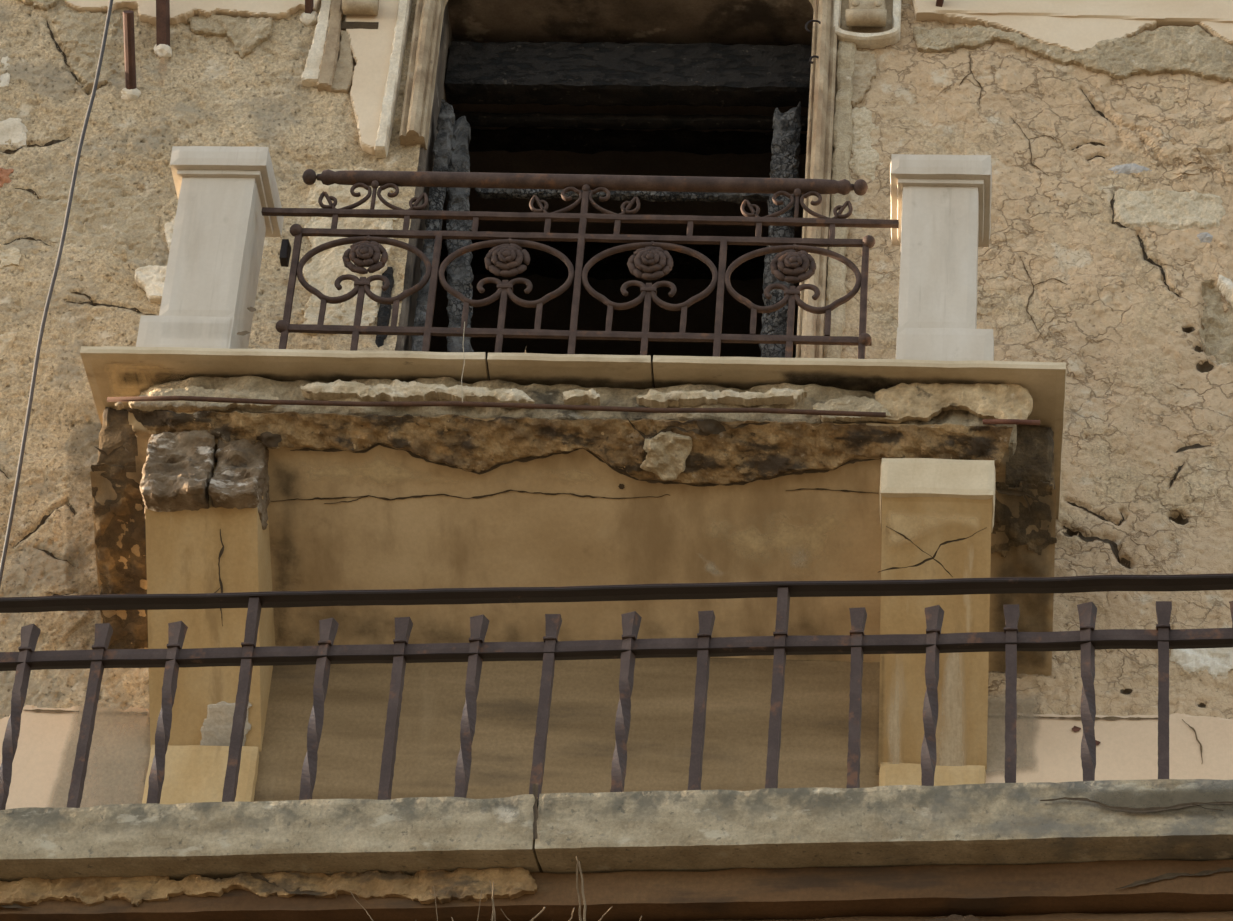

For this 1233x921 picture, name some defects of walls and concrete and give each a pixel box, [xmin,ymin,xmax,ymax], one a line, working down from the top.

crack [47,22,107,95]
crack [1011,89,1108,176]
crack [1110,195,1179,297]
spalling [115,386,279,412]
spalling [301,379,535,409]
spalling [563,388,601,406]
spalling [636,383,1033,434]
spalling [256,432,282,447]
crack [272,418,884,504]
crack [1169,443,1211,488]
crack [1063,501,1124,563]
flaking render [0,867,538,908]